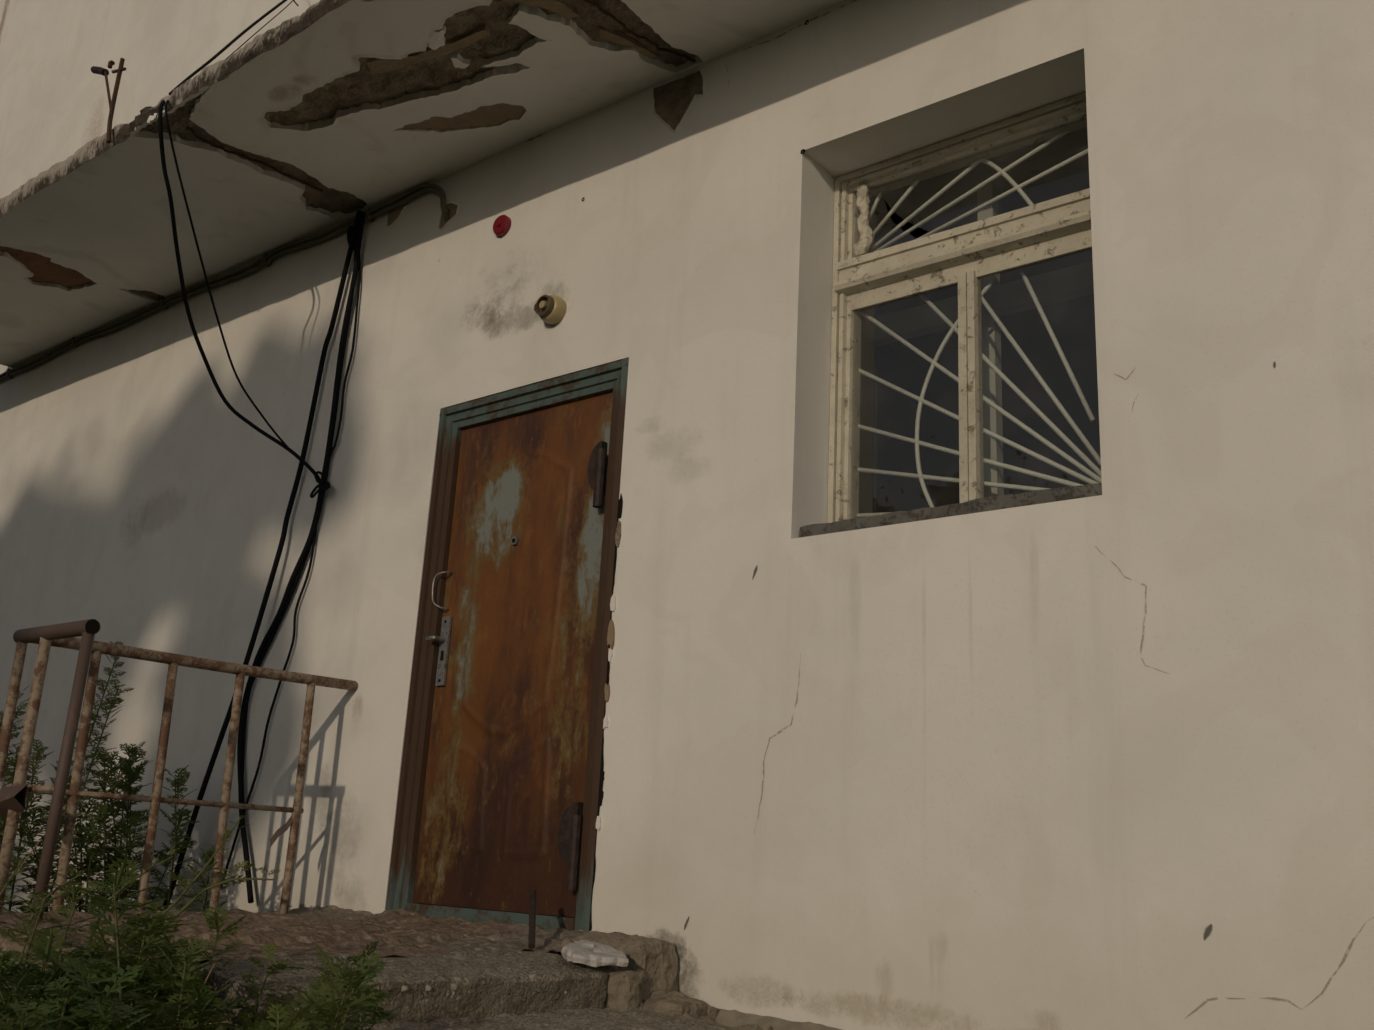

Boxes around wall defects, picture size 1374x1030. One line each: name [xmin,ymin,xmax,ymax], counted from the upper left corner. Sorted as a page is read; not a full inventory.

spalling [259,0,708,134]
spalling [130,86,407,228]
spalling [0,245,168,303]